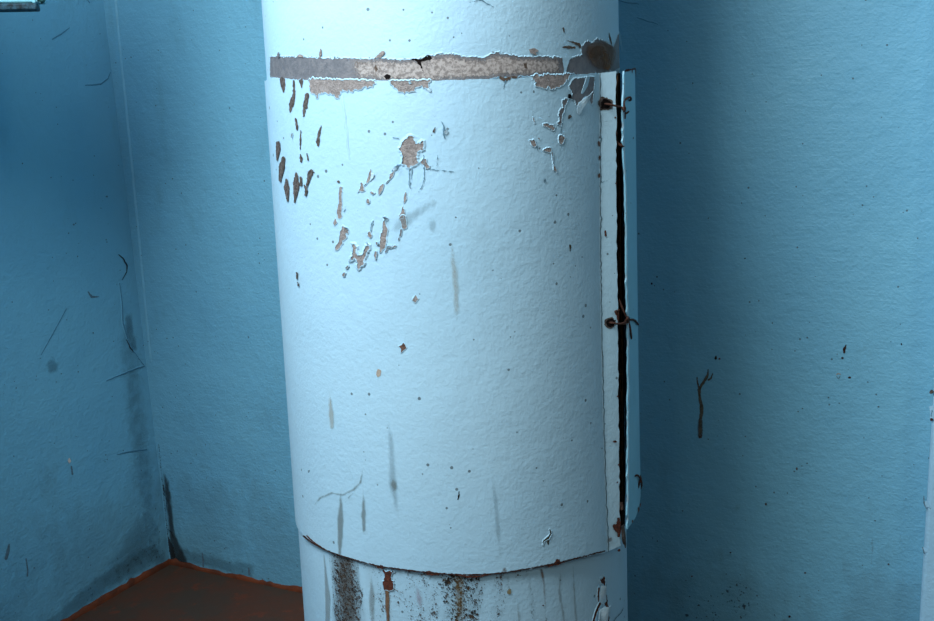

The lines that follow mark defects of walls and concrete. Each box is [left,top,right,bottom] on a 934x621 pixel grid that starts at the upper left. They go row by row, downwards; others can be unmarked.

peeling [270,27,630,522]
corrosion [303,43,641,621]
peeling [592,574,623,621]